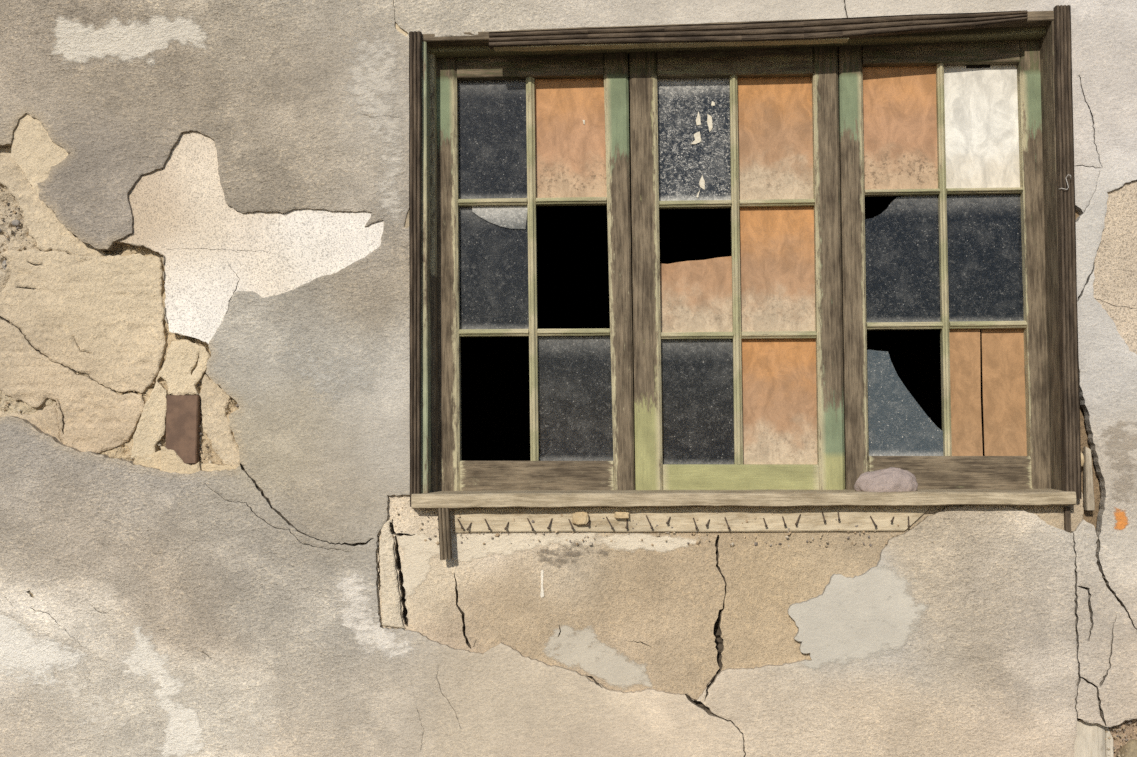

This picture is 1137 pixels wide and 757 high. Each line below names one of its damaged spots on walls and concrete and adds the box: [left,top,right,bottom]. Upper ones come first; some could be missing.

spalling [0,114,384,474]
spalling [1081,180,1137,354]
spalling [1008,405,1101,533]
spalling [376,495,963,707]
crack [685,535,746,756]
crack [1071,531,1137,724]
spalling [1105,718,1137,757]